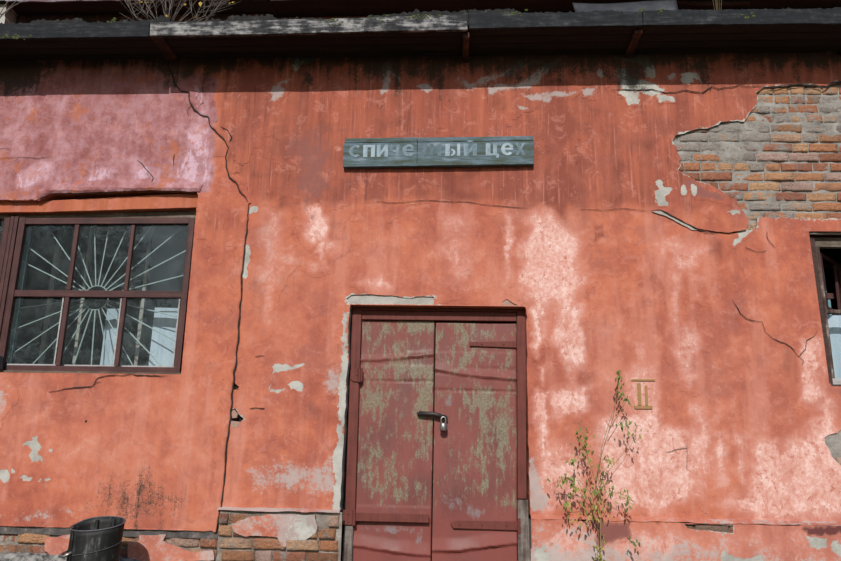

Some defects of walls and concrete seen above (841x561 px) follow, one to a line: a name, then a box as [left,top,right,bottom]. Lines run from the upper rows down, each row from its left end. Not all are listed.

damp [0,59,183,153]
peeling [513,54,704,112]
crack [615,81,841,93]
flaking render [652,83,841,249]
crack [168,61,265,532]
damp [176,52,841,561]
crack [733,301,817,364]
damp [39,374,113,414]
crack [51,374,158,392]
flaking render [120,295,434,561]
damp [120,468,155,513]
peeling [0,499,80,555]